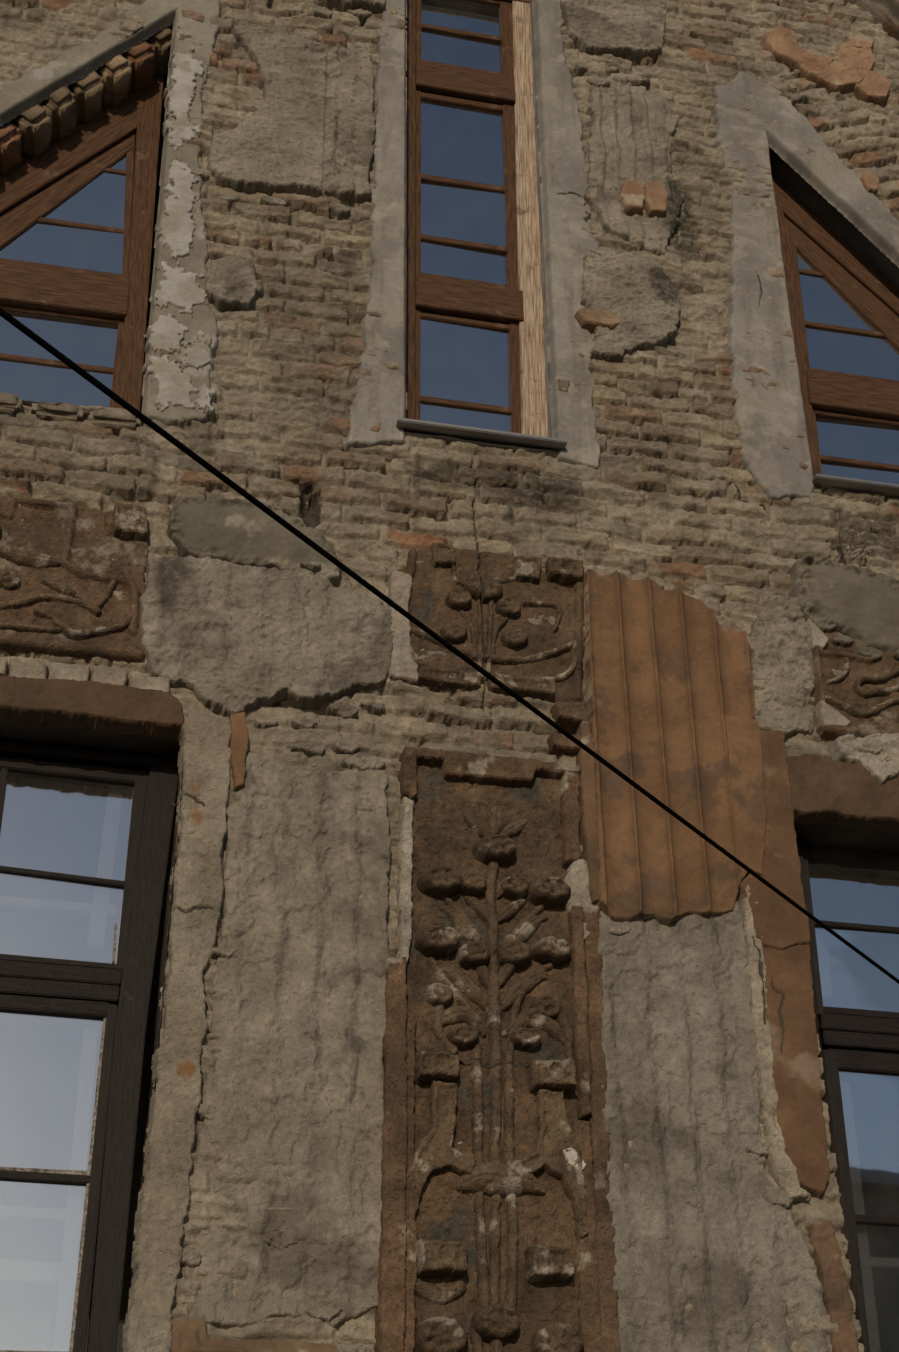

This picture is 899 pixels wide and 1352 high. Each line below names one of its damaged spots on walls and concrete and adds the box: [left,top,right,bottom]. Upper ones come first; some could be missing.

peeling [760,26,899,106]
peeling [142,45,215,420]
crack [471,461,485,711]
spalling [749,595,899,784]
crack [170,793,204,806]
crack [177,906,214,914]